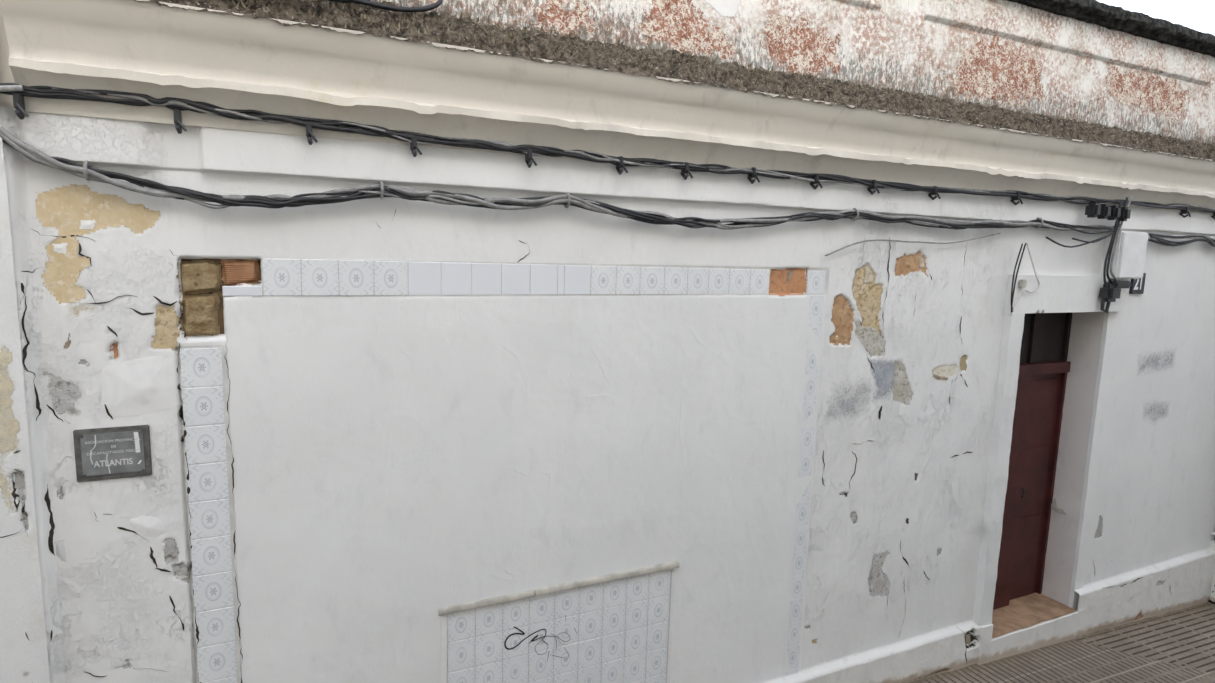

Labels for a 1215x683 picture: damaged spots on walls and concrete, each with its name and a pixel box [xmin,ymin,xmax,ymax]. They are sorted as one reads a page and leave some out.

crack [20,271,70,424]
peeling [35,184,160,311]
crack [32,229,177,337]
peeling [151,258,261,350]
spalling [830,263,914,406]
spalling [894,251,928,277]
peeling [933,355,968,380]
crack [0,450,63,556]
spalling [163,538,194,583]
spalling [868,551,890,597]